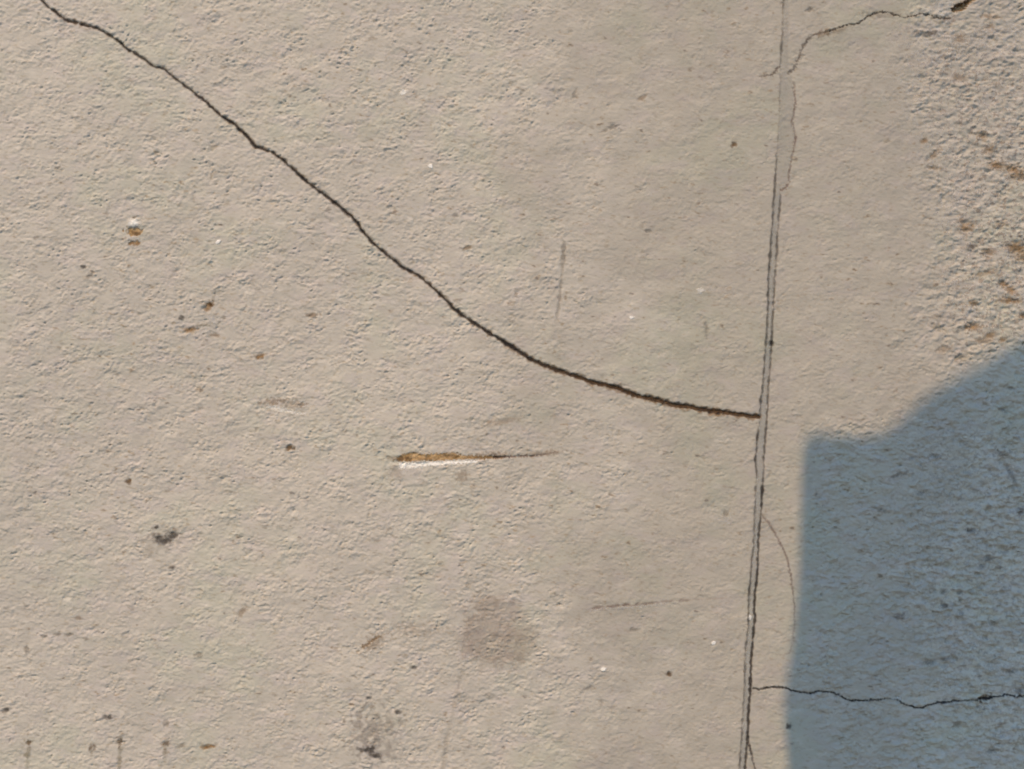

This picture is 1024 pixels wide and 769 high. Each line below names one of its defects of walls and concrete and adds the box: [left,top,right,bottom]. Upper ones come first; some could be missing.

crack [805,11,950,44]
crack [41,0,767,463]
crack [744,485,1022,769]